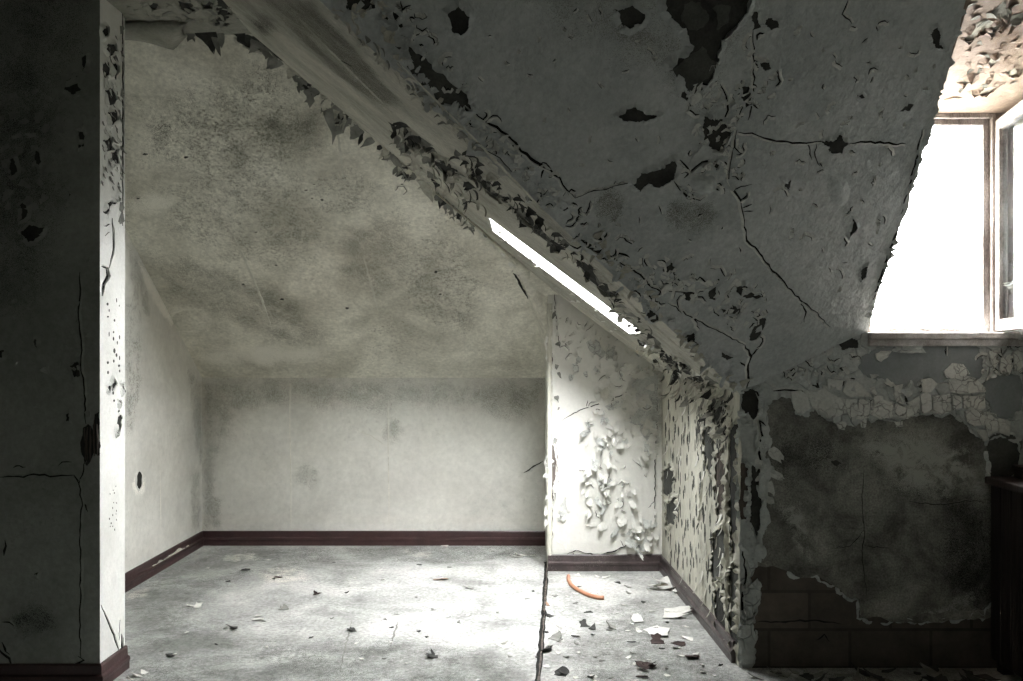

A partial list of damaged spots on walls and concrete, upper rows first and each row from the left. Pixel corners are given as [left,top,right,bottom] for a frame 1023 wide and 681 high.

peeling [99,0,240,224]
crack [0,460,124,664]
flaking render [80,412,101,466]
leakage [125,59,545,531]
crack [561,339,662,554]
spalling [233,0,1023,668]
crack [357,0,1023,462]
leakage [760,419,991,614]